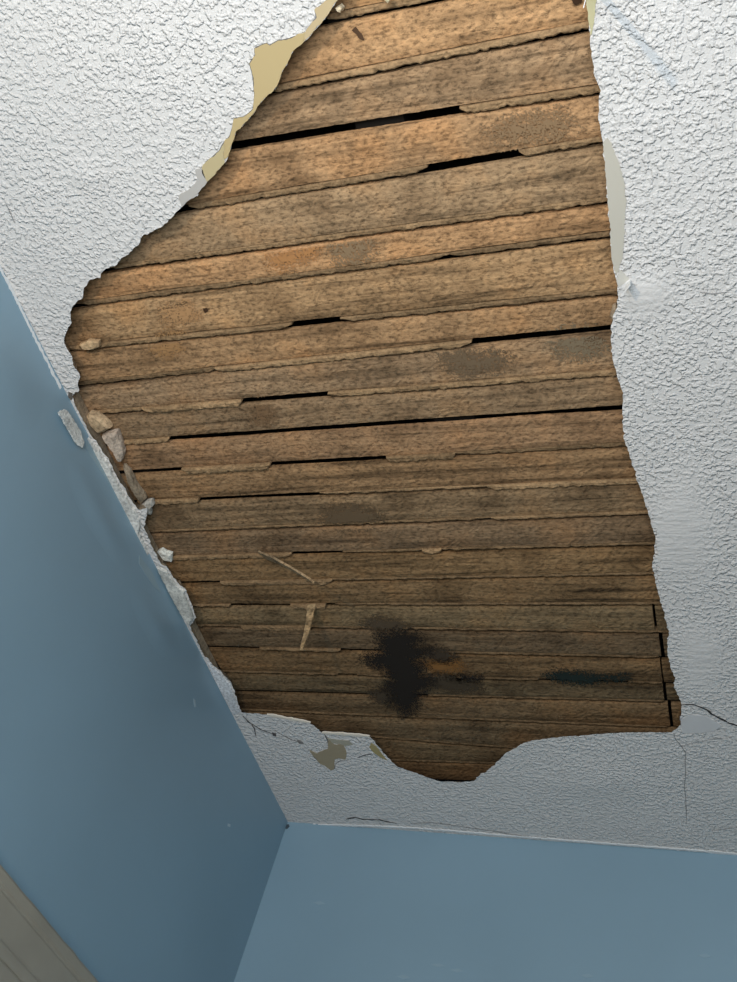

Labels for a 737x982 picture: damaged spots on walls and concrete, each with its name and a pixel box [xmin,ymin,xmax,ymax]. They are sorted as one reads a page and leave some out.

peeling [179,0,337,206]
spalling [603,138,631,292]
spalling [87,437,149,555]
spalling [157,567,194,625]
spalling [206,661,240,714]
spalling [267,713,311,723]
peeling [297,731,386,770]
water stain [359,613,491,720]
water stain [540,665,633,688]
crack [673,704,737,824]